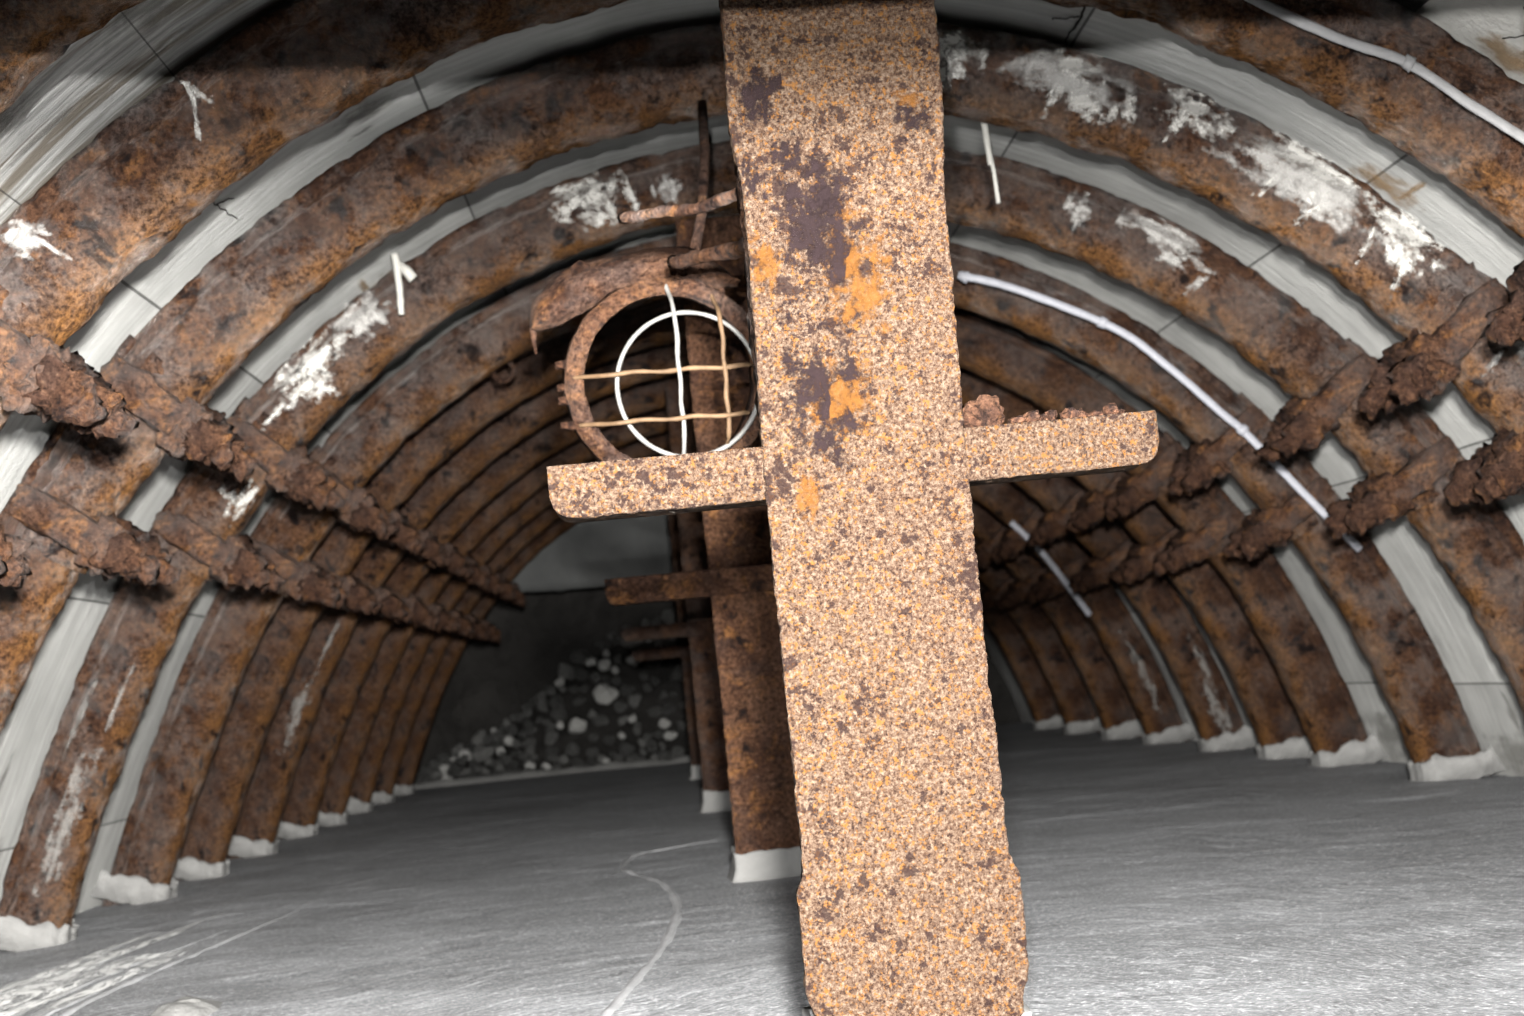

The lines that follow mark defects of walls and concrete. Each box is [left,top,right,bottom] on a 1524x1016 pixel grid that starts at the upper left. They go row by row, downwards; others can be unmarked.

corrosion [1482,40,1524,71]
leakage [1011,48,1136,122]
corrosion [893,90,935,141]
leakage [1164,89,1236,141]
leakage [552,176,681,227]
leakage [1064,193,1090,226]
leakage [1230,132,1442,287]
corrosion [1360,169,1424,200]
leakage [5,221,57,257]
leakage [1116,217,1210,286]
corrosion [739,60,892,516]
leakage [263,299,386,424]